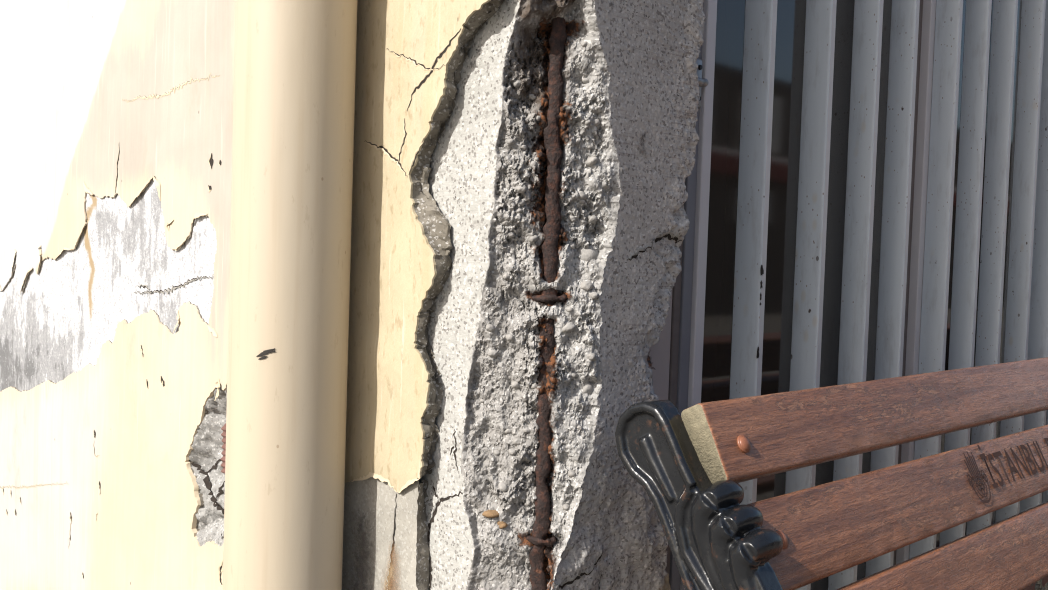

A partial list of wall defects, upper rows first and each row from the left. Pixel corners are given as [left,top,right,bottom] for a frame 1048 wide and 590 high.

crack [364,28,461,177]
peeling [0,176,218,391]
spalling [461,0,622,590]
rust [517,17,587,590]
crack [626,230,682,261]
spalling [642,201,690,396]
spalling [189,379,227,546]
flaking render [342,472,432,590]